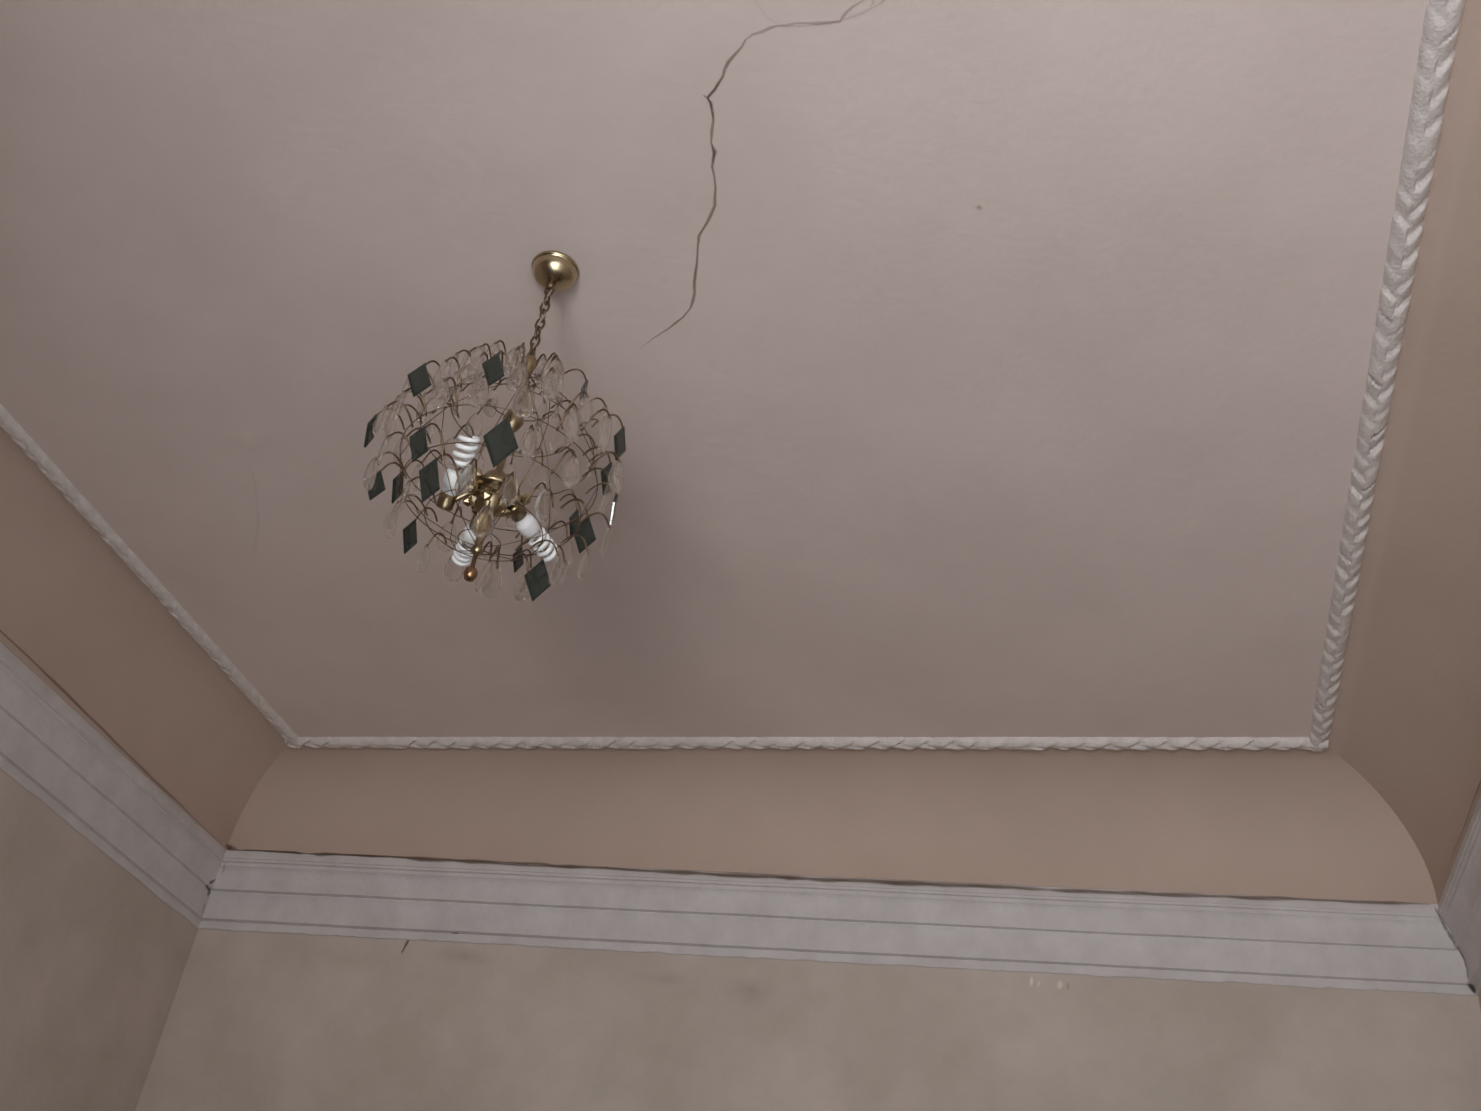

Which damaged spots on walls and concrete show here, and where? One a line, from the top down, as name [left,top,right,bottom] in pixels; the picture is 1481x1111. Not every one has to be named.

crack [663,52,737,332]